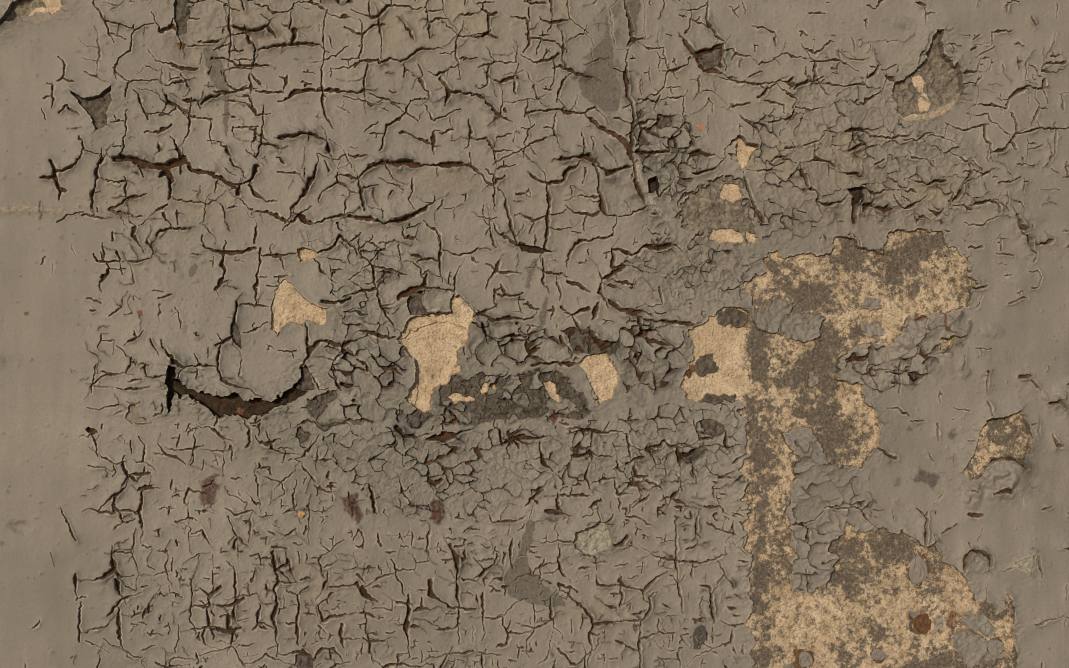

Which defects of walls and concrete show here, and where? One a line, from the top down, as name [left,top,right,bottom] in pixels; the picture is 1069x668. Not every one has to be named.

spalling [0,0,62,26]
crack [733,0,1069,306]
crack [37,200,45,220]
crack [39,0,917,426]
crack [972,284,990,310]
spalling [167,30,1018,668]
crack [790,346,1069,602]
spalling [963,410,1033,481]
crack [59,506,79,544]
crack [72,388,754,668]
crack [30,617,43,631]
crack [1029,547,1069,629]